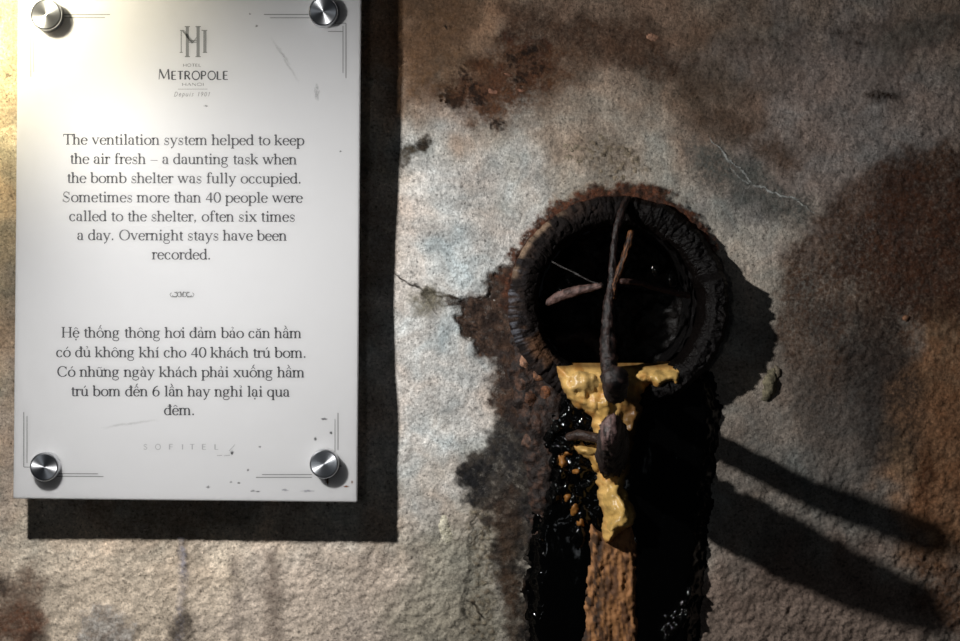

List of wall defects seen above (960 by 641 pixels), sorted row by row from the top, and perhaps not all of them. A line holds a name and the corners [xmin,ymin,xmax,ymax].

crack [395,274,458,299]
corrosion [495,181,718,307]
damp [500,5,960,466]
crack [710,139,814,213]
corrosion [505,335,561,544]